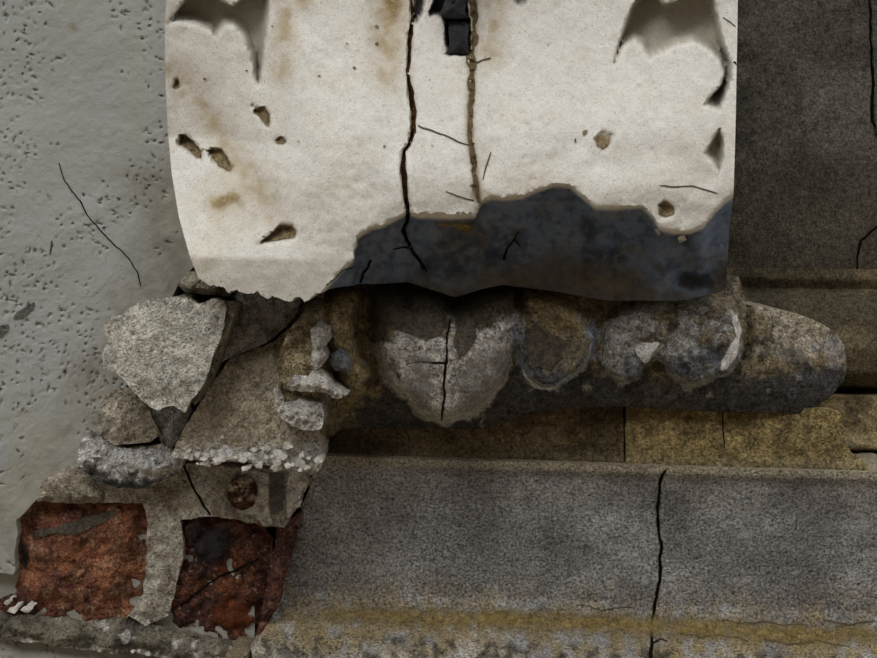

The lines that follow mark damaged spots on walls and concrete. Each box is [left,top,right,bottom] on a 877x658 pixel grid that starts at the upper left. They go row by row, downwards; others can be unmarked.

spalling [440,0,469,55]
crack [868,0,877,135]
peeling [180,135,232,171]
peeling [253,108,269,126]
crack [393,0,491,271]
peeling [574,130,610,149]
crack [59,163,141,286]
peeling [263,226,295,242]
peeling [659,201,674,217]
crack [326,260,372,286]
crack [406,318,451,421]
crack [583,469,875,658]